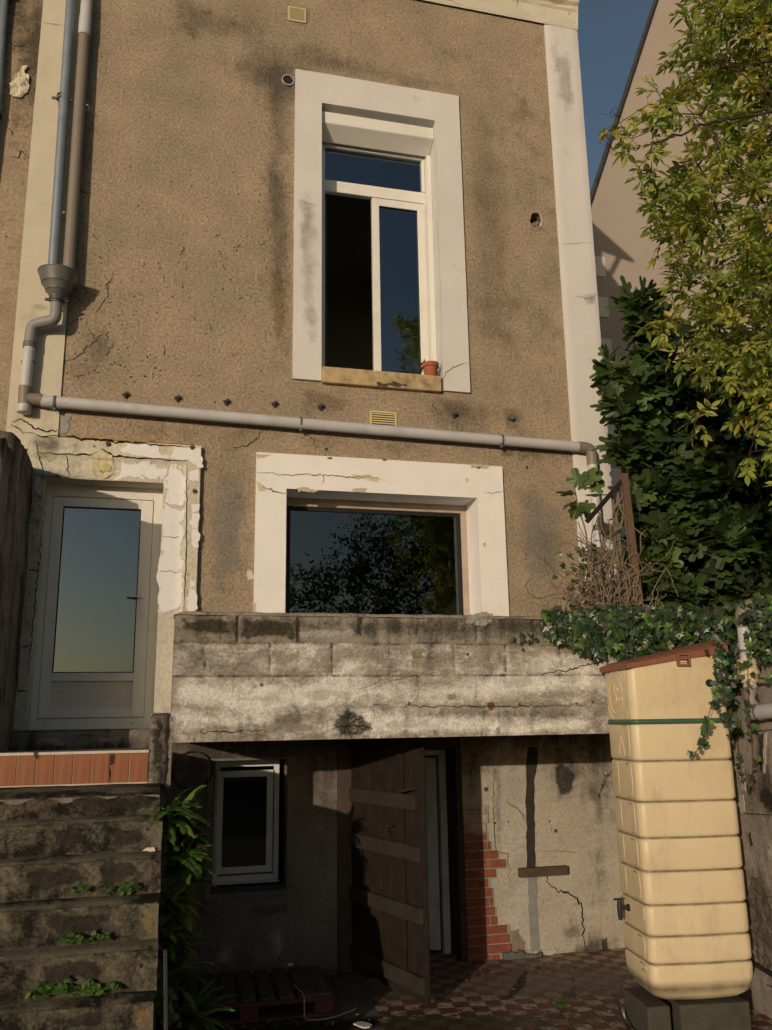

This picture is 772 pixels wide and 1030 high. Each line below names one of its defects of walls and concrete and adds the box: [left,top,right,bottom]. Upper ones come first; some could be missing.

crack [257,472,378,494]
peeling [114,443,203,613]
crack [200,727,268,735]
leakage [306,690,371,735]
crack [333,671,590,738]
flaking render [449,770,526,962]
crack [535,850,588,950]